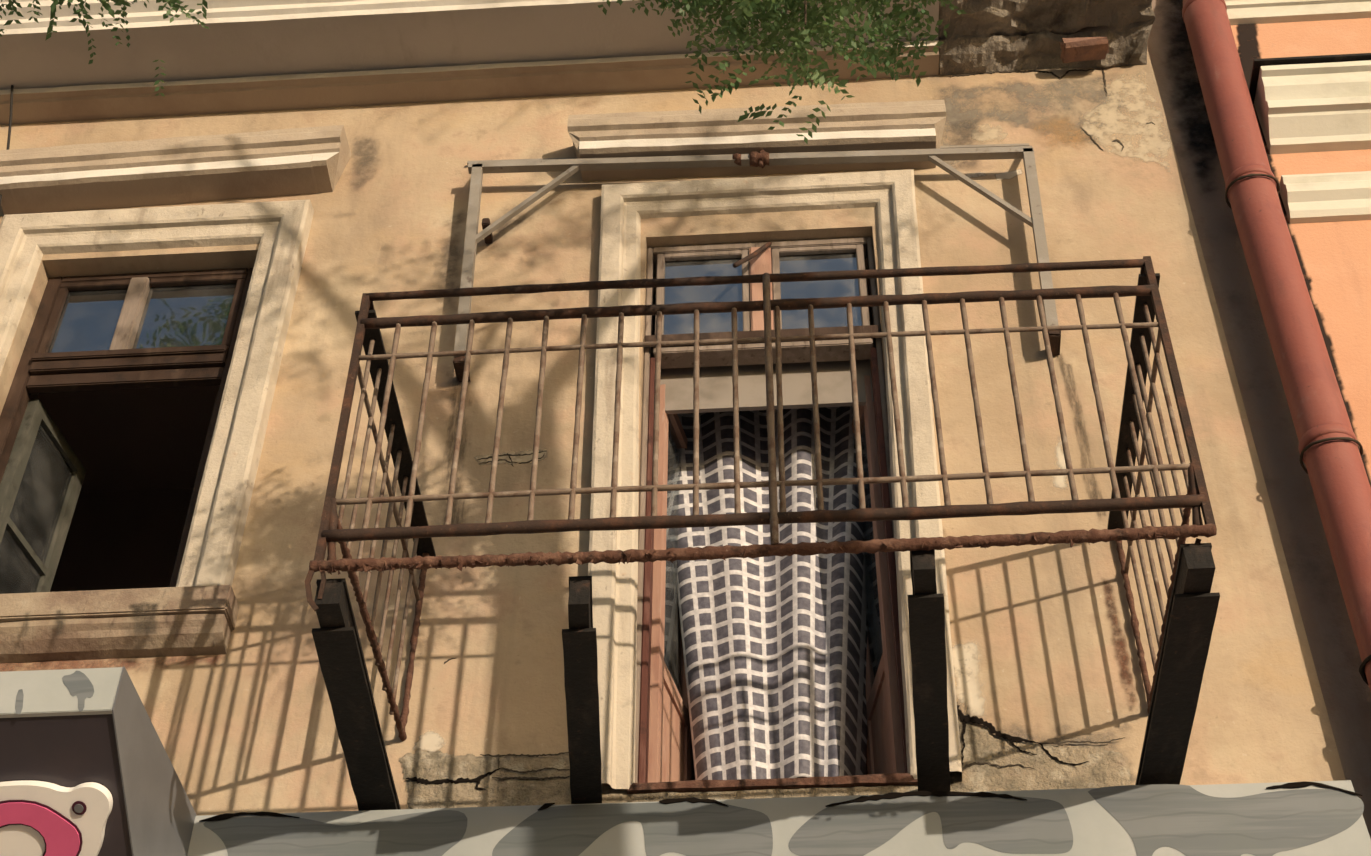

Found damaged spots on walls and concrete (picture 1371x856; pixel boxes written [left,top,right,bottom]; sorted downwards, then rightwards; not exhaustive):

flaking render [1059,36,1171,168]
flaking render [966,169,1022,180]
corrosion [1104,581,1134,702]
flaking render [399,732,571,809]
flaking render [602,785,918,803]
crack [952,702,1125,773]
flaking render [950,643,1132,792]